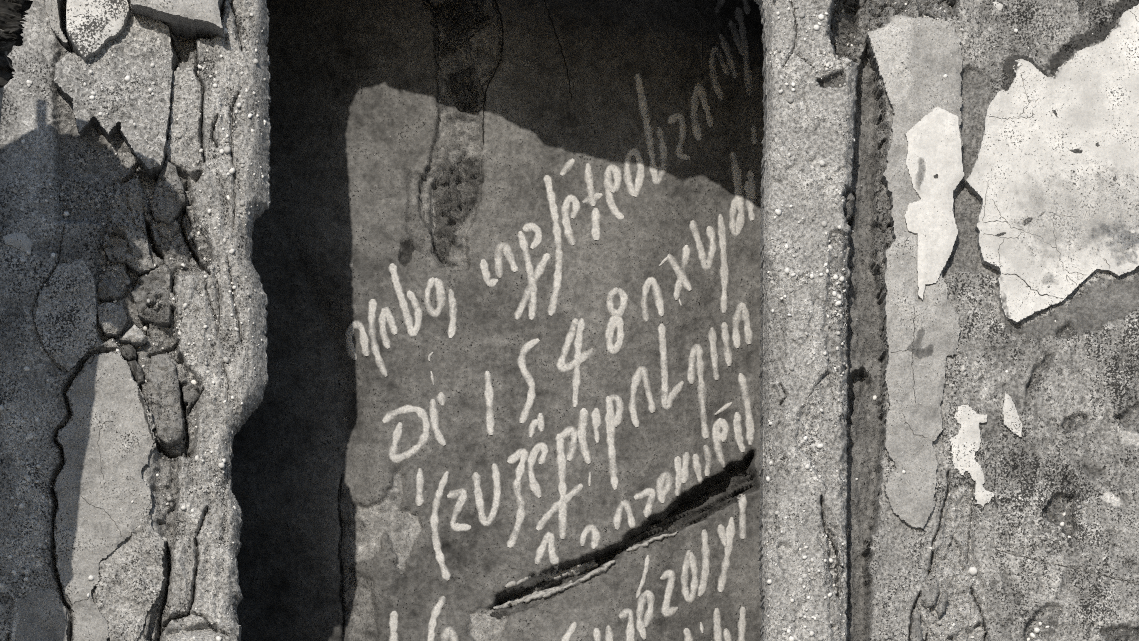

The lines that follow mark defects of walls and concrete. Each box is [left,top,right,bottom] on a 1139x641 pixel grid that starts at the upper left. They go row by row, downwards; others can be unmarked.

flaking render [44,0,224,179]
crack [230,0,242,48]
crack [145,227,162,259]
crack [170,36,242,343]
flaking render [817,4,1139,529]
crack [32,229,121,641]
crack [131,340,229,459]
crack [157,507,224,641]
crack [909,471,974,641]
crack [971,593,988,641]
spalling [1043,486,1079,538]